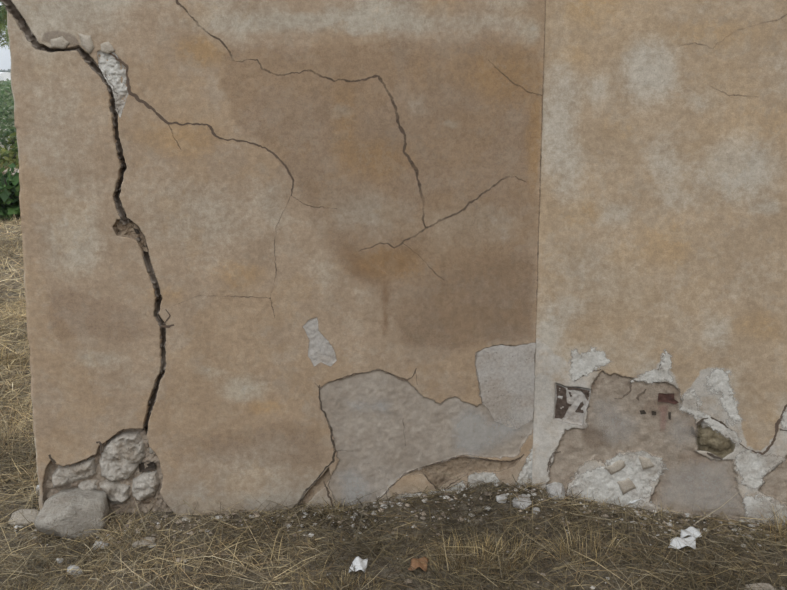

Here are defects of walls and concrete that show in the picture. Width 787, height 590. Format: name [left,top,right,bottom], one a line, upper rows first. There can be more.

crack [289,70,421,191]
crack [0,0,294,432]
crack [361,179,503,250]
peeling [303,317,337,366]
spalling [43,428,172,515]
spalling [294,468,330,507]
spalling [395,447,533,499]
spalling [546,347,787,525]